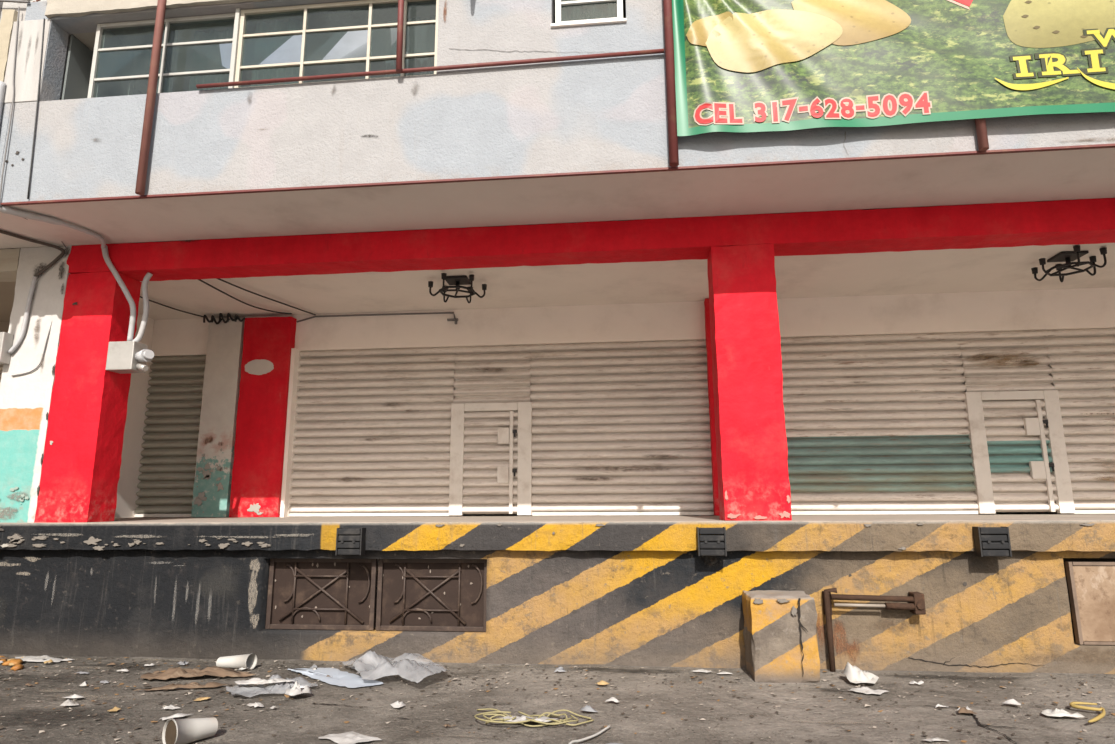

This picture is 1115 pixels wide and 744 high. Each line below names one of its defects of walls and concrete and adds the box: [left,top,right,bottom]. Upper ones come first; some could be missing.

spalling [0,486,163,575]
flaking render [188,534,310,628]
crack [797,598,808,674]
rust [817,588,926,672]
crack [908,657,1045,668]